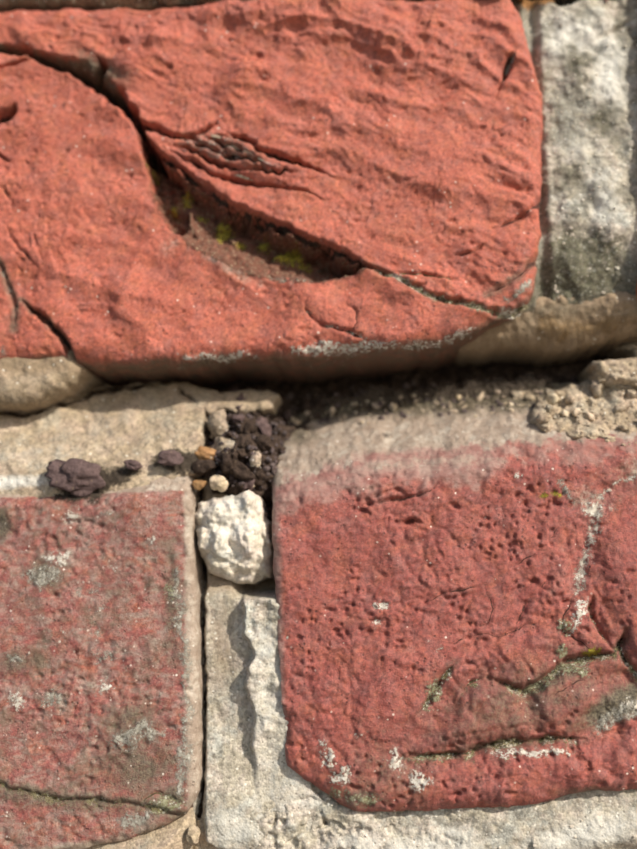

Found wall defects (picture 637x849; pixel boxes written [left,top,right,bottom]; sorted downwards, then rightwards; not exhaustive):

crack [501,53,515,84]
spalling [137,132,370,283]
crack [82,82,539,319]
crack [0,263,72,352]
crack [423,667,480,711]
crack [433,587,525,644]
crack [504,602,637,704]
crack [414,734,577,764]